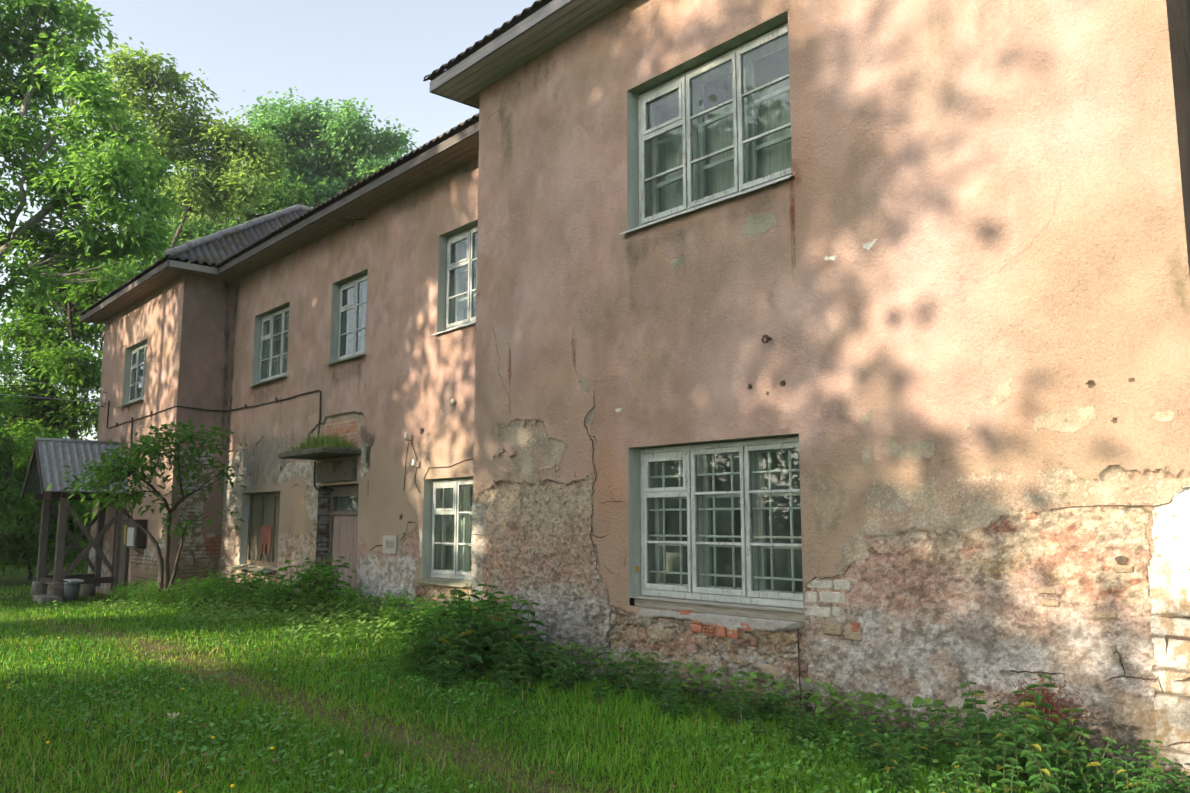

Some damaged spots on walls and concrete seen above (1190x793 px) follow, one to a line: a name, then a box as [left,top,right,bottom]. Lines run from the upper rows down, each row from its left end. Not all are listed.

flaking render [277,460,322,592]
flaking render [307,413,368,482]
flaking render [357,523,422,613]
flaking render [471,419,611,680]
crack [572,329,626,575]
flaking render [803,464,1190,779]